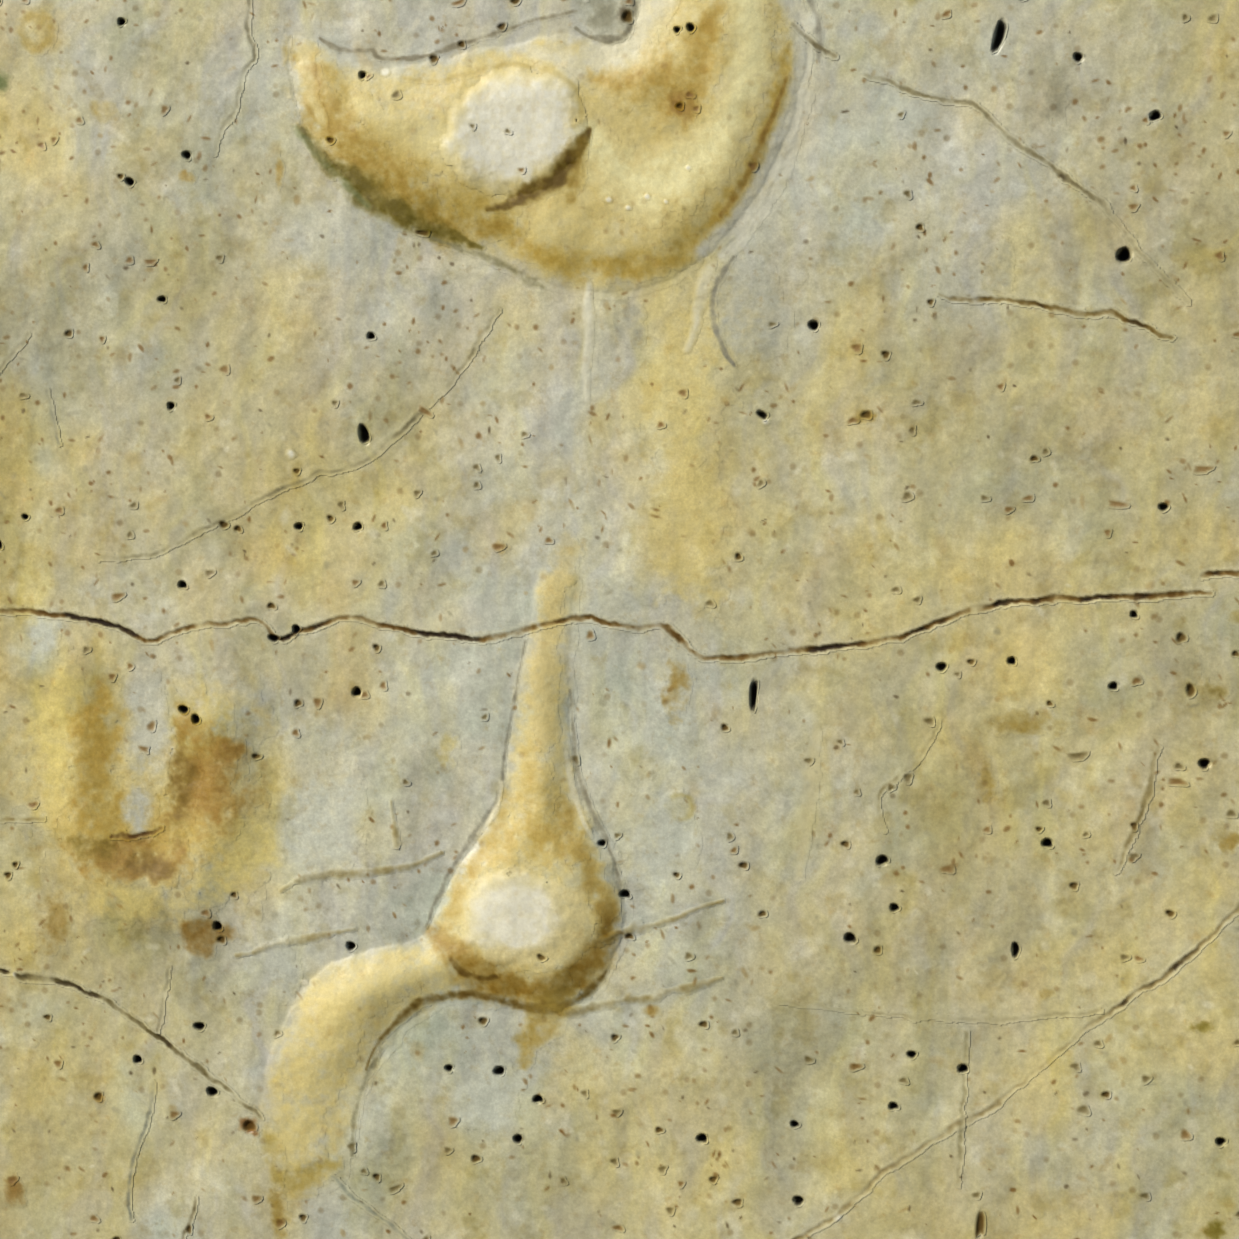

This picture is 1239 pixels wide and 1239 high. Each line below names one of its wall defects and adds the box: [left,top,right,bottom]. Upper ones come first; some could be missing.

crack [789,20,1191,342]
crack [0,568,1239,663]
crack [0,815,46,824]
crack [107,825,165,842]
crack [1112,743,1163,876]
crack [0,965,265,1121]
crack [790,901,1239,1239]
crack [124,1079,157,1223]
crack [179,1194,199,1239]
crack [330,1174,411,1239]